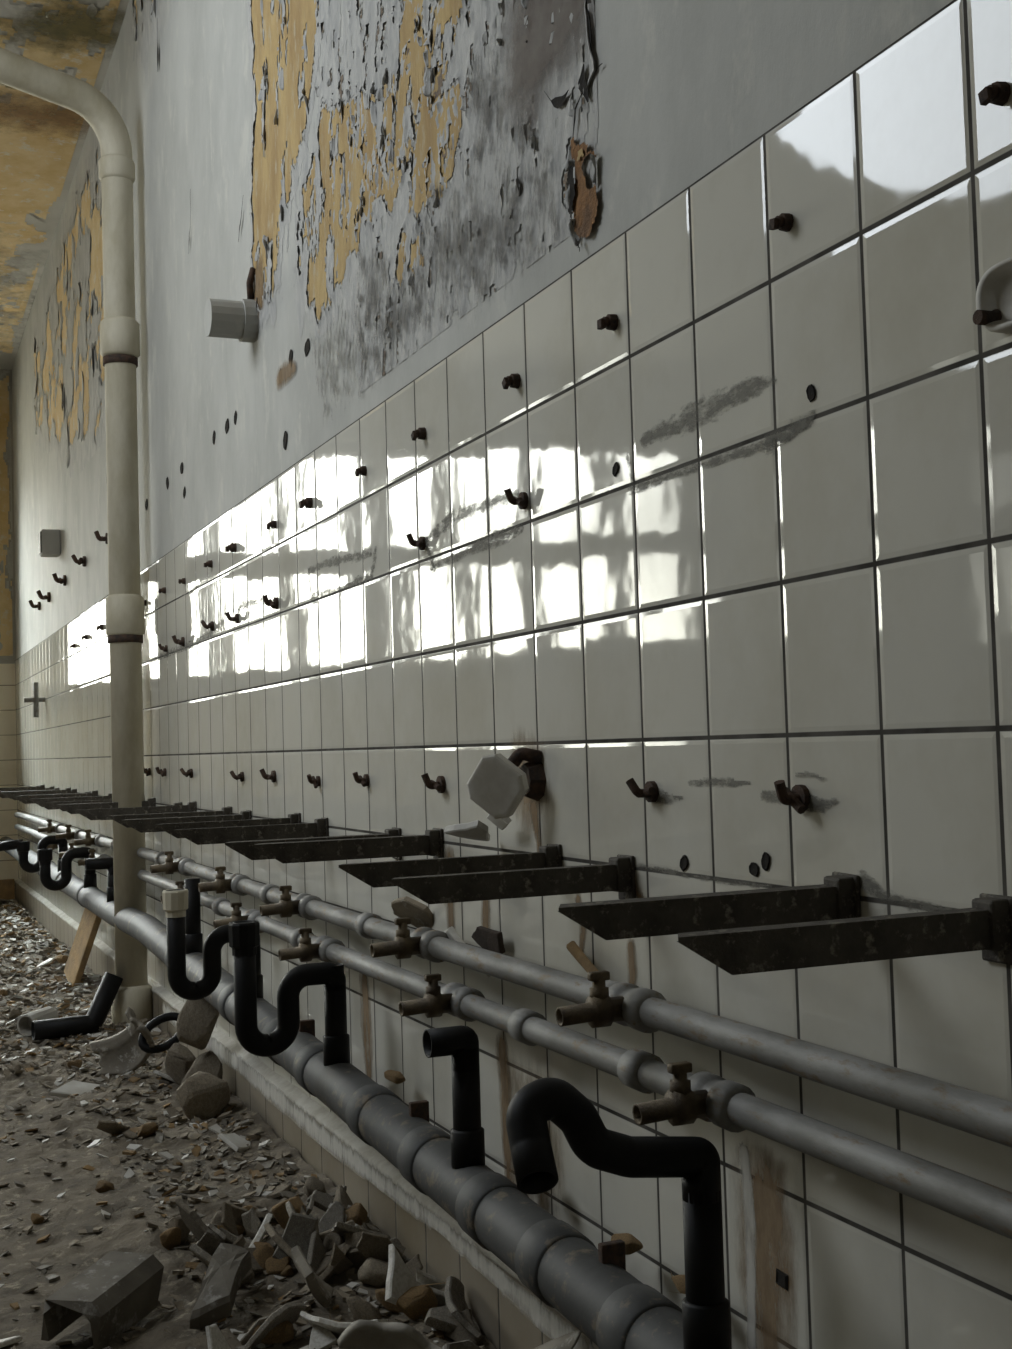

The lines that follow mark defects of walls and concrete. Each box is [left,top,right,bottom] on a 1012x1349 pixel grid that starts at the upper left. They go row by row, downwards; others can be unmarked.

damp [0,84,86,131]
peeling [0,83,106,656]
damp [14,0,125,50]
peeling [0,0,165,100]
peeling [247,0,599,393]
damp [315,170,556,408]
damp [467,0,585,159]
rust [739,1144,793,1349]